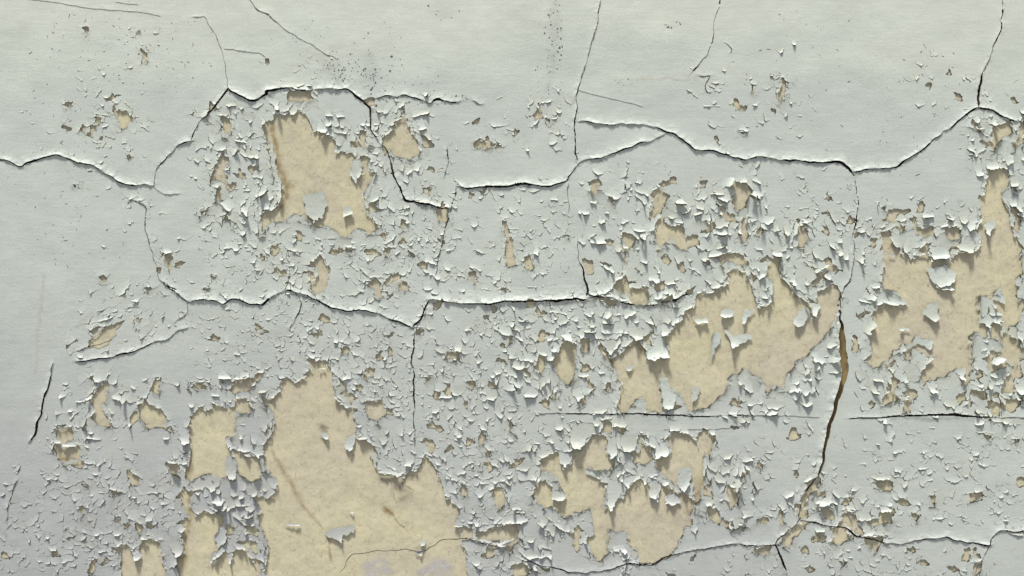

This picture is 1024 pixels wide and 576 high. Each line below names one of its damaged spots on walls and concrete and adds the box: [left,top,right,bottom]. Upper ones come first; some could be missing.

peeling [47,26,173,232]
crack [0,16,486,196]
peeling [452,176,504,203]
peeling [513,181,577,244]
peeling [66,235,193,362]
peeling [191,314,231,354]
peeling [201,269,231,301]
crack [72,197,688,442]
crack [382,0,1024,576]
crack [27,359,54,444]
peeling [783,411,815,441]
crack [340,538,501,572]